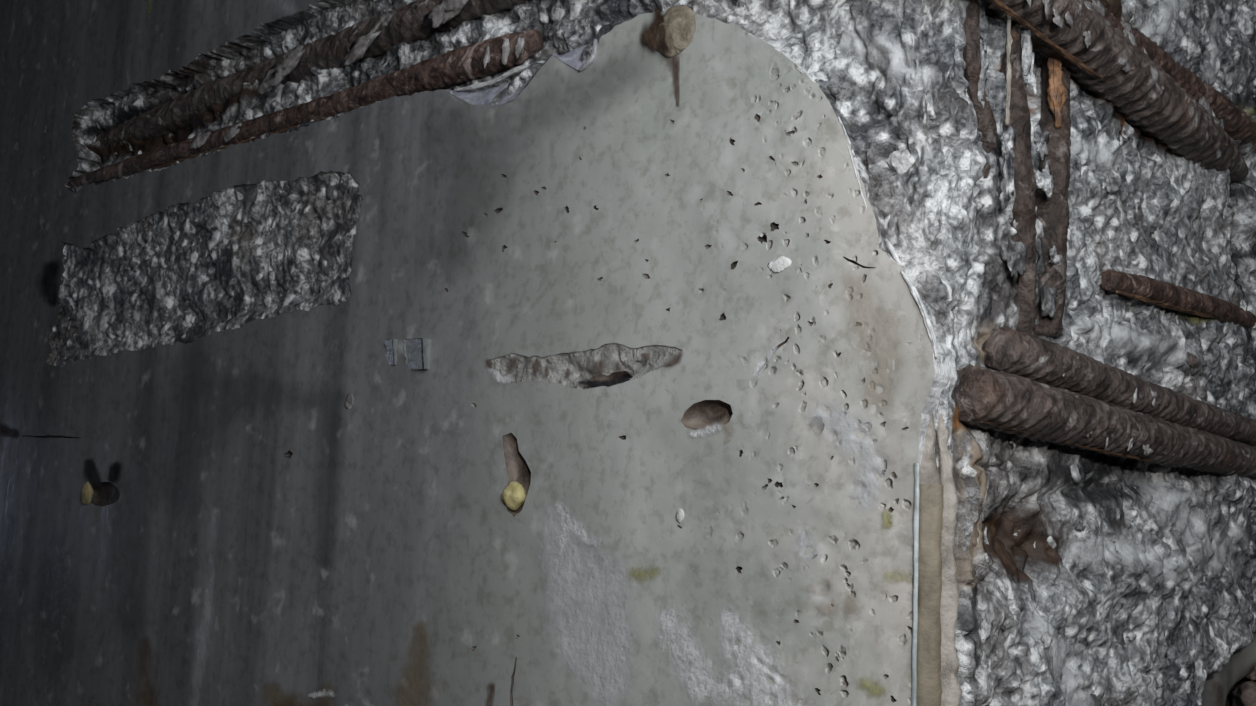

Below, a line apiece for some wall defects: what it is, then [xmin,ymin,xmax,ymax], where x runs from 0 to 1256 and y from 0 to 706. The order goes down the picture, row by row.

rust [1097,0,1132,23]
rust [86,87,262,162]
spalling [66,0,705,194]
rust [1088,90,1170,152]
spalling [48,172,363,366]
spalling [486,343,682,390]
spalling [705,0,1256,706]
rust [981,507,1062,582]